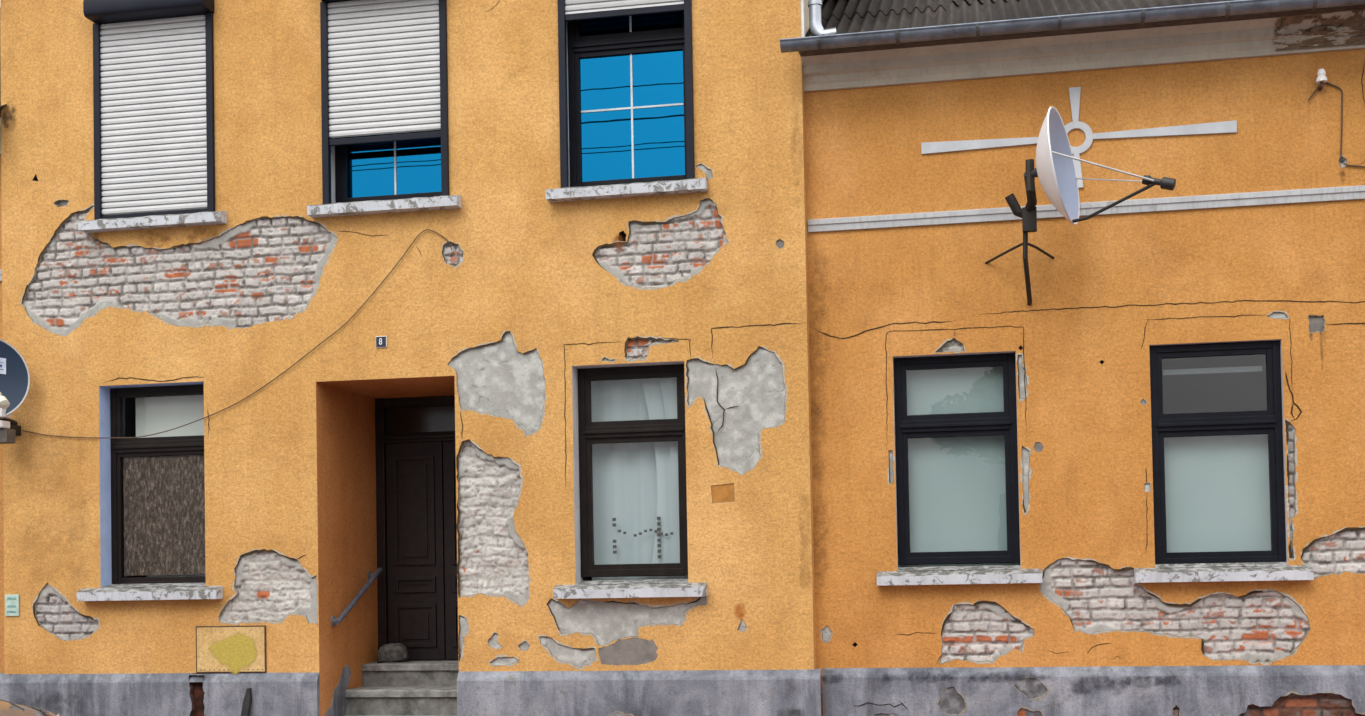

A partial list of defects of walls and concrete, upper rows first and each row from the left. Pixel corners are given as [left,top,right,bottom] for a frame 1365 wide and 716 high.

flaking render [20,199,338,336]
flaking render [592,198,730,290]
flaking render [447,330,547,436]
crack [564,342,612,489]
flaking render [685,346,787,503]
crack [662,300,1365,450]
flaking render [218,549,318,625]
flaking render [456,439,531,607]
flaking render [488,596,707,670]
flaking render [939,601,1034,664]
flaking render [1039,557,1311,665]
flaking render [1284,418,1365,579]